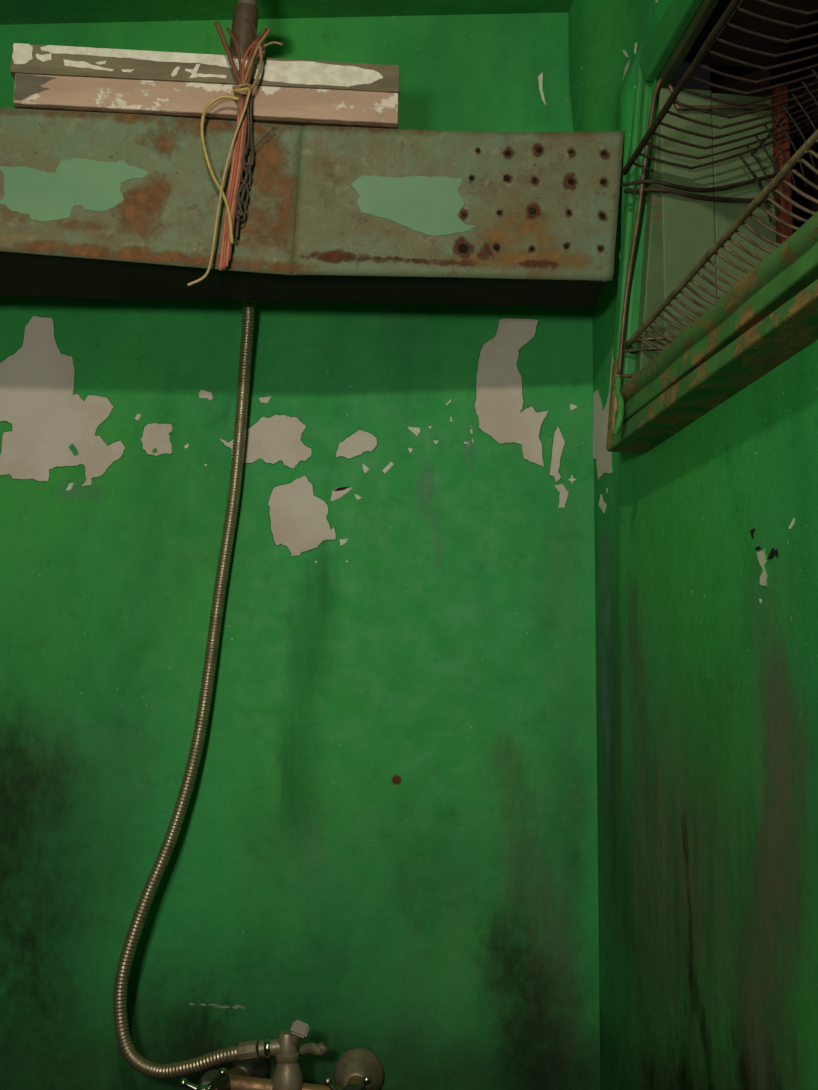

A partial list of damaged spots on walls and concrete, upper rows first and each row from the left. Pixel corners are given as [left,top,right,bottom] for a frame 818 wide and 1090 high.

peeling [0,316,126,491]
peeling [135,414,189,457]
peeling [219,414,362,563]
peeling [335,429,378,473]
peeling [464,317,576,508]
peeling [593,350,614,513]
spalling [750,528,778,604]
damp [739,667,800,1090]